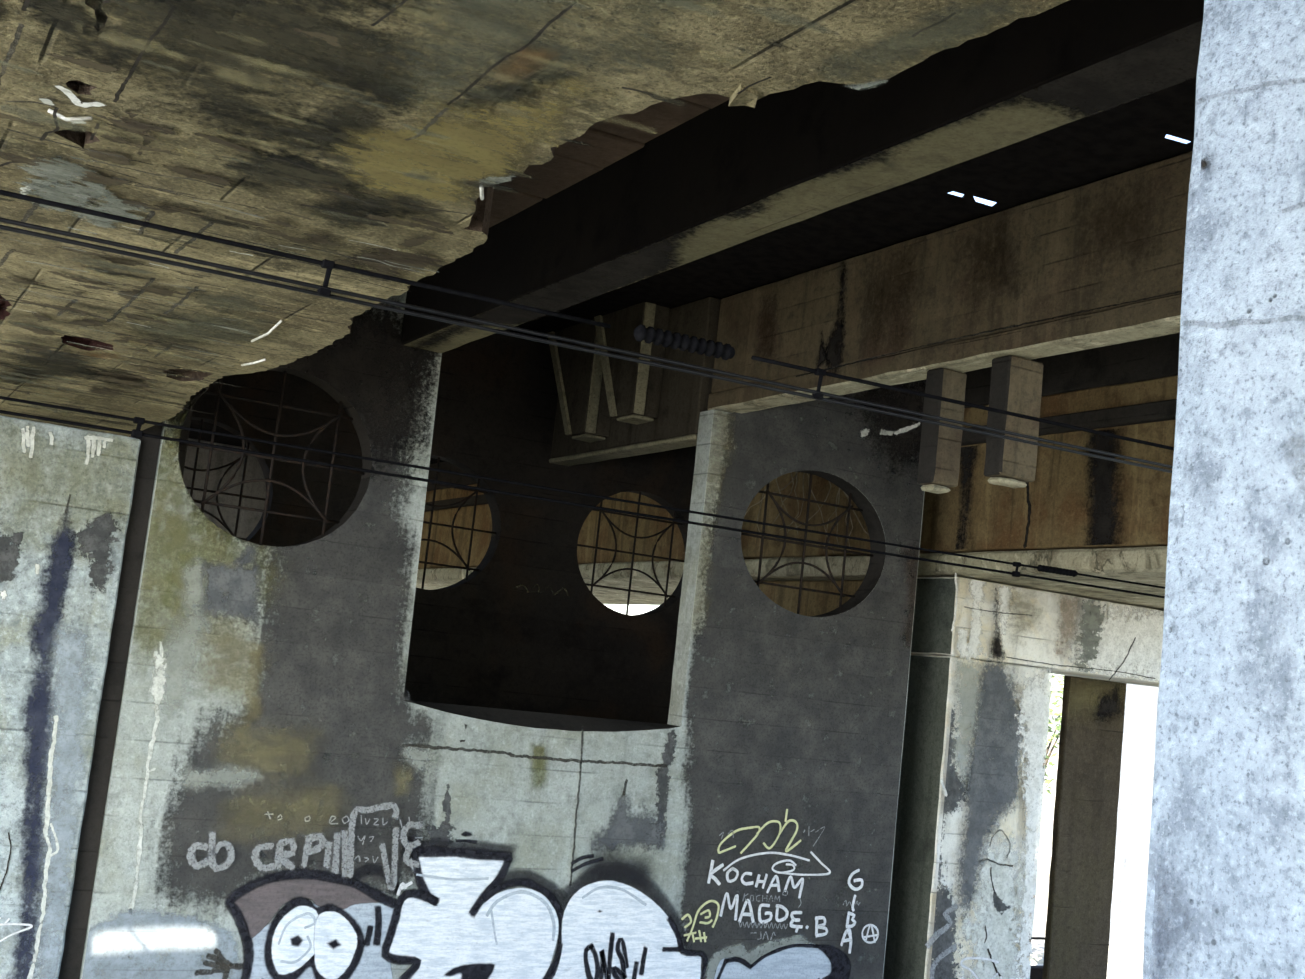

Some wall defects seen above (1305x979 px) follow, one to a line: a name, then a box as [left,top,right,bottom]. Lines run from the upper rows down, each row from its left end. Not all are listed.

peeling [46,53,121,95]
peeling [85,0,189,71]
peeling [0,105,468,292]
damp [21,0,670,273]
damp [0,261,262,388]
peeling [0,232,344,429]
damp [816,262,847,374]
crack [796,291,1182,377]
damp [1062,599,1164,711]
damp [930,573,1055,979]